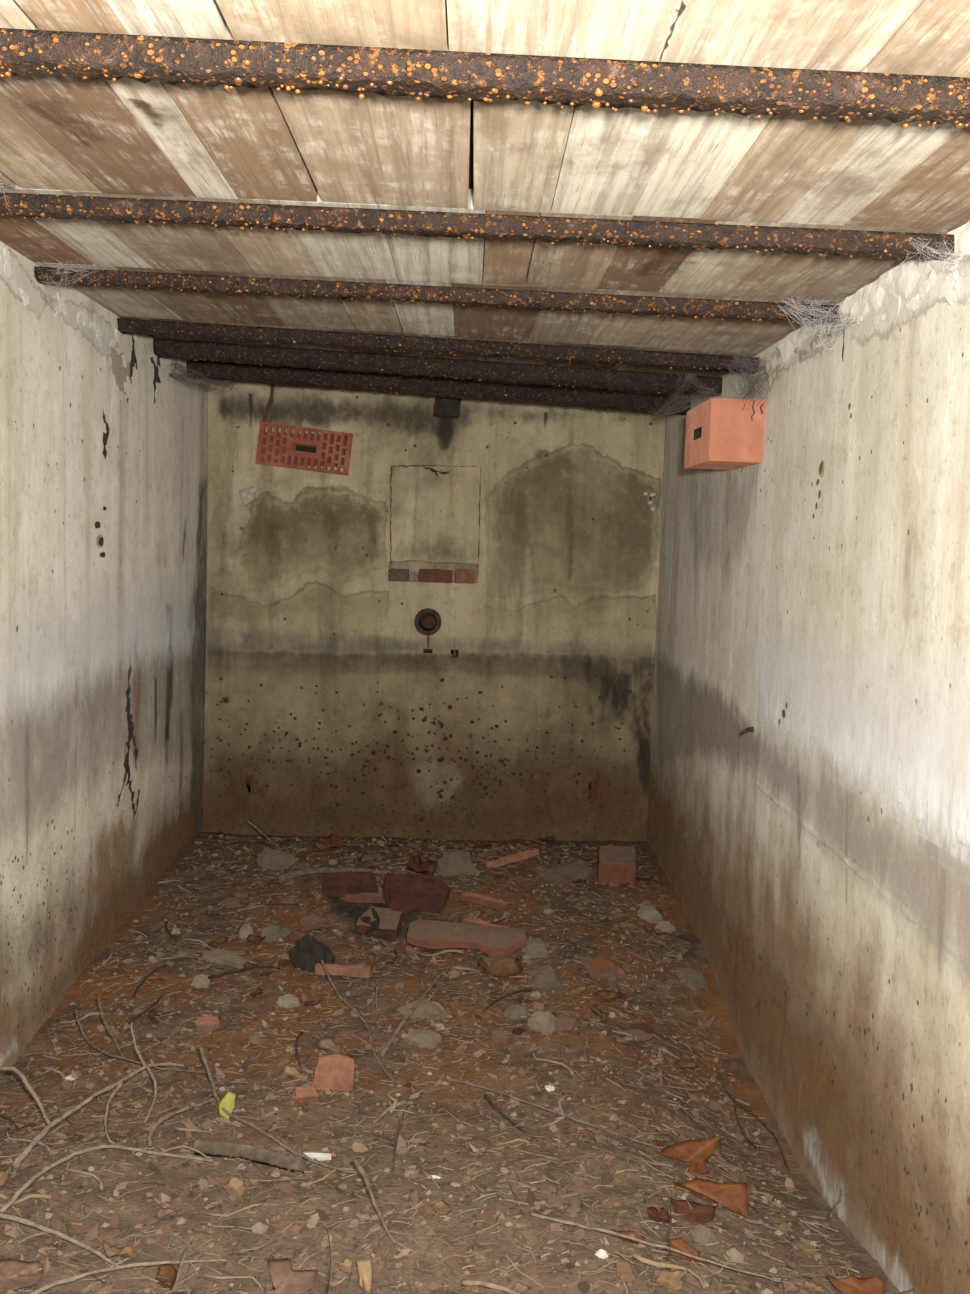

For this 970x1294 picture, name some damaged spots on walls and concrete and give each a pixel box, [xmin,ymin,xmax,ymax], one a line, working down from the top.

crack [661,0,686,60]
leakage [251,496,379,539]
leakage [11,483,218,969]
crack [117,655,140,821]
leakage [586,659,970,970]